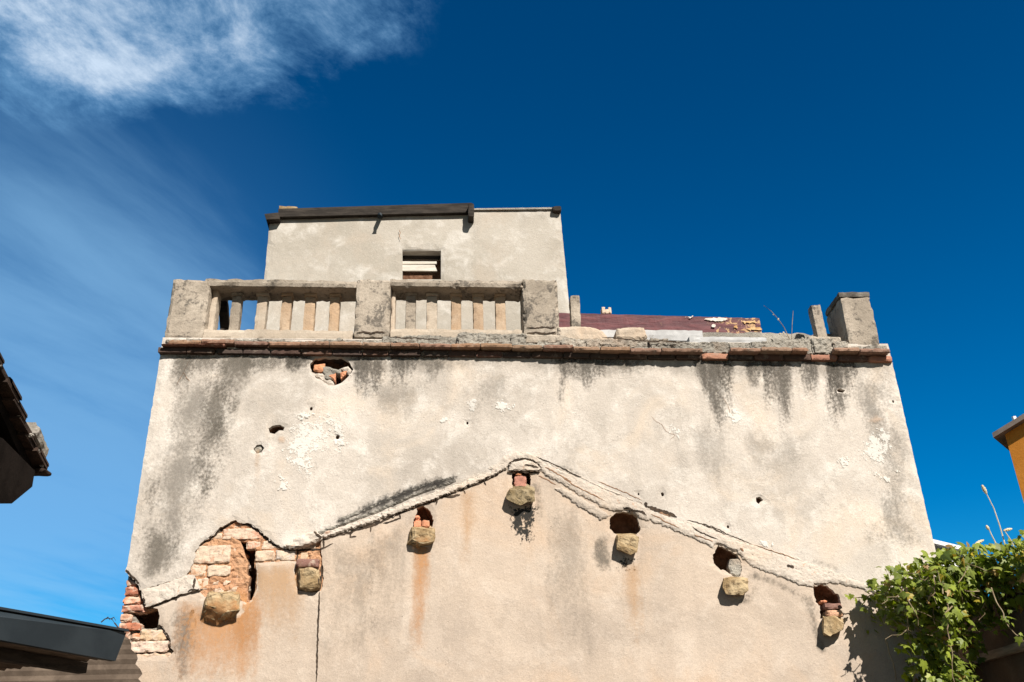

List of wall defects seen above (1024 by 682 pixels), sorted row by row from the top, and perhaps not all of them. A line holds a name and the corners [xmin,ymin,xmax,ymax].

hole [311,359,353,385]
water stain [696,359,731,422]
water stain [746,361,856,414]
peeling [269,407,348,476]
water stain [147,535,171,574]
spalling [119,521,324,658]
crack [200,456,798,682]
corrosion [188,595,256,660]